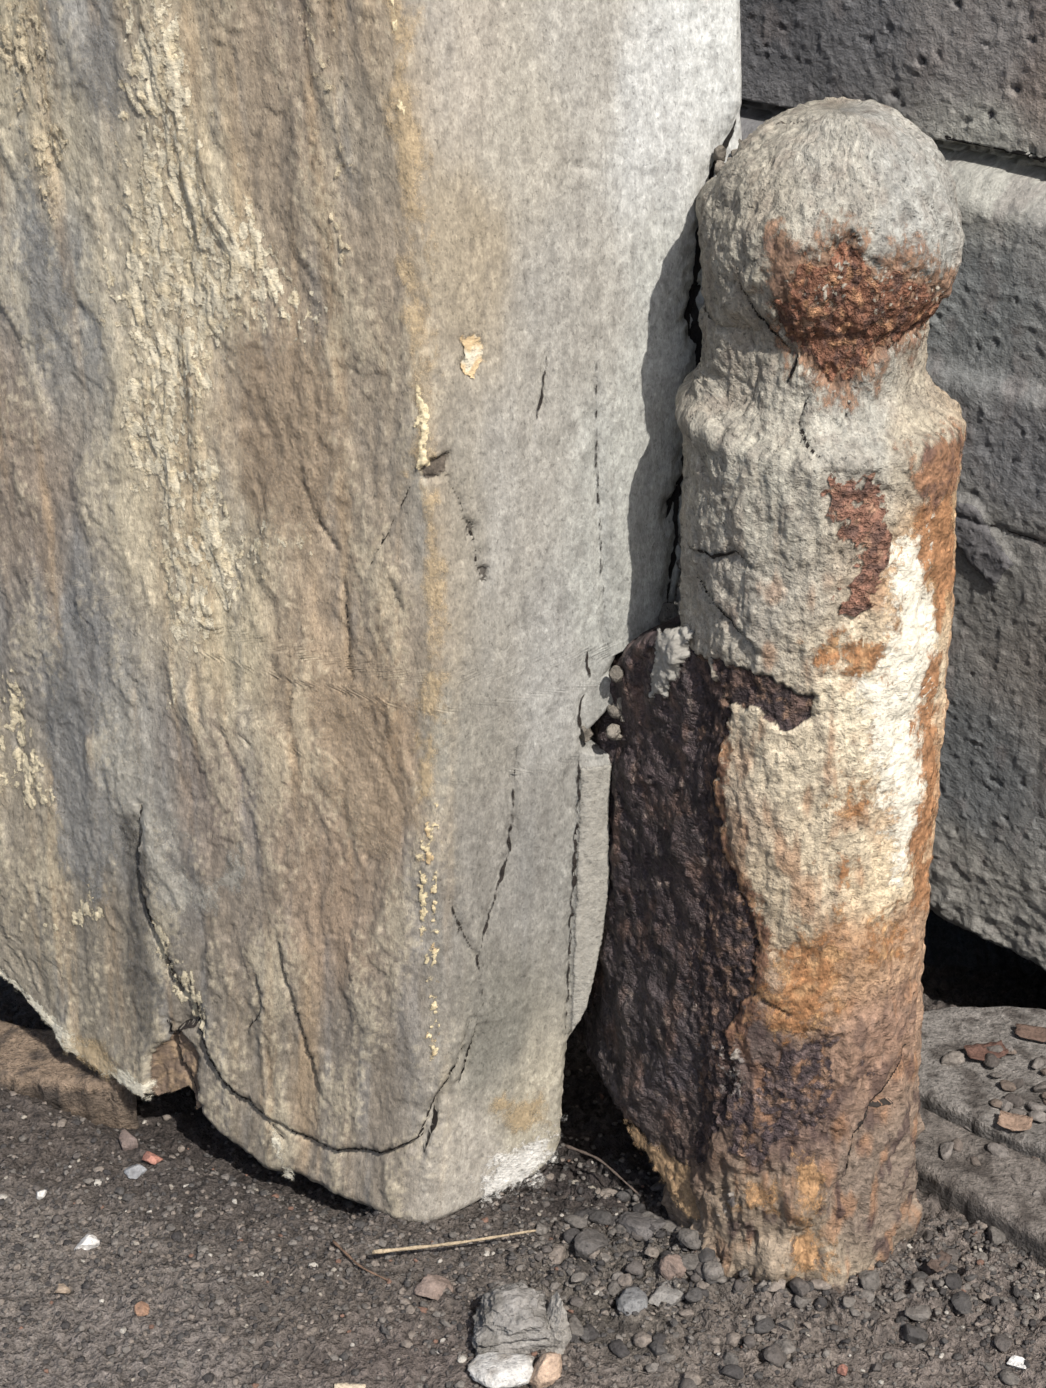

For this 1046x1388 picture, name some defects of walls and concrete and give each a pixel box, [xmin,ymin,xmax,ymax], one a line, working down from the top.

spalling [460,333,483,378]
crack [536,356,547,418]
rust [755,210,957,413]
rust [800,472,902,686]
rust [893,419,966,634]
crack [137,754,517,1154]
crack [565,652,591,1029]
spalling [648,624,842,1166]
rust [713,651,944,1045]
rust [627,1125,701,1220]
rust [727,1182,780,1215]
rust [790,1152,840,1281]